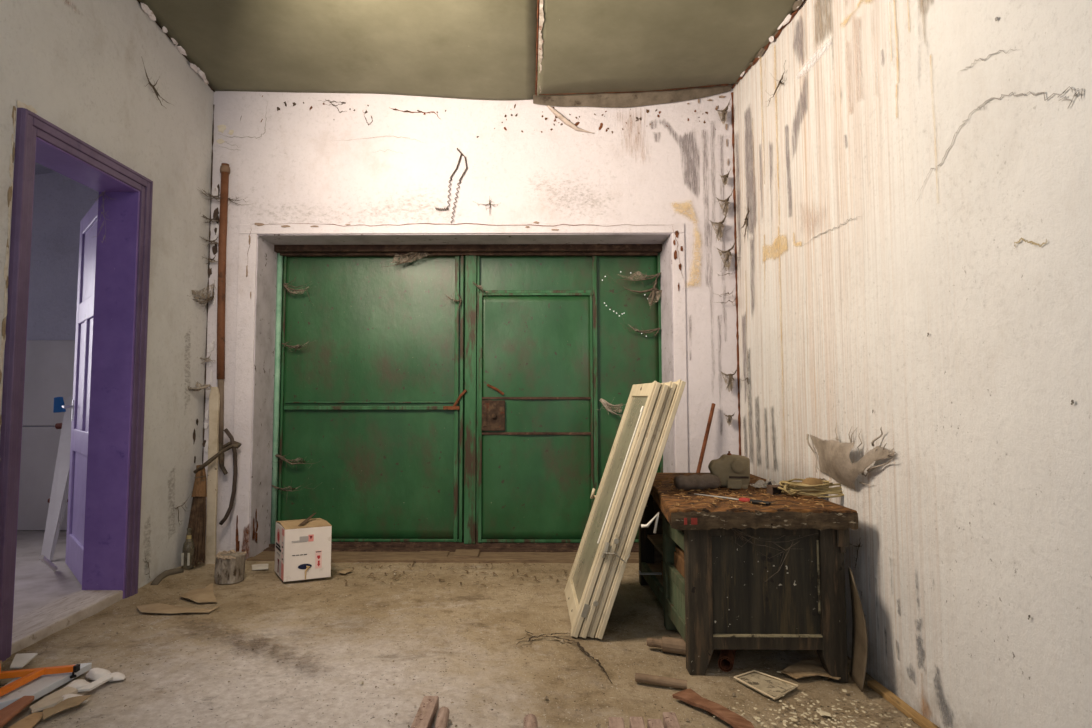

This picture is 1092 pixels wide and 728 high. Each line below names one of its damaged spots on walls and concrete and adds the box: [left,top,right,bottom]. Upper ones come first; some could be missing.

flaking render [140,2,209,85]
crack [917,86,1085,200]
crack [731,1,805,455]
crack [517,631,612,683]